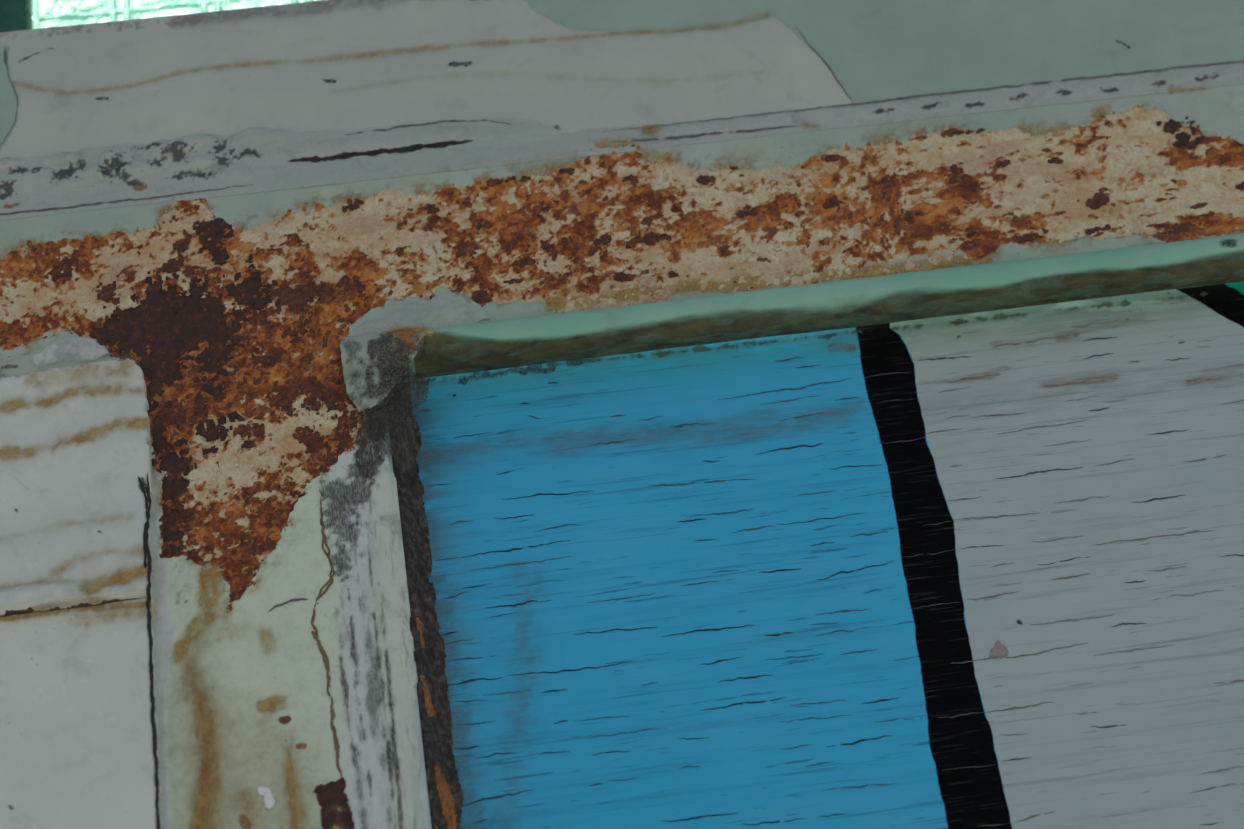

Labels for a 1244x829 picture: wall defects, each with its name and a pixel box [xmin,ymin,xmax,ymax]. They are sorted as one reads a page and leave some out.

crack [288,119,512,162]
peeling [32,337,110,366]
corrosion [0,105,1244,662]
crack [0,473,161,829]
crack [267,488,343,778]
water stain [340,598,403,829]
corrosion [420,675,435,717]
corrosion [191,691,217,829]
corrosion [285,743,306,829]
corrosion [314,778,355,829]
corrosion [434,765,457,829]